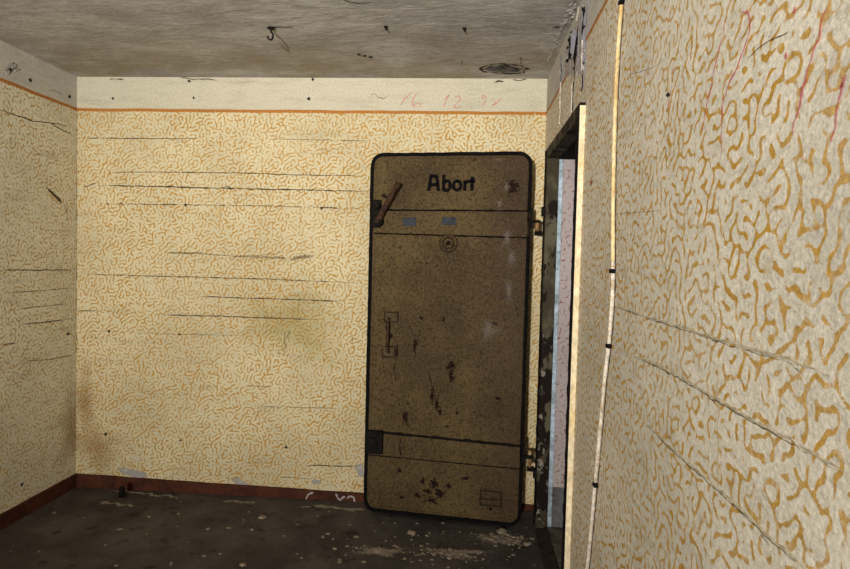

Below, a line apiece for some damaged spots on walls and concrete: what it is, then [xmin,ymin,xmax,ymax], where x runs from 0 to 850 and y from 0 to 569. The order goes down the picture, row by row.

crack [5,111,195,139]
crack [599,301,829,376]
crack [633,356,849,476]
corrosion [414,477,451,505]
crack [642,420,806,569]